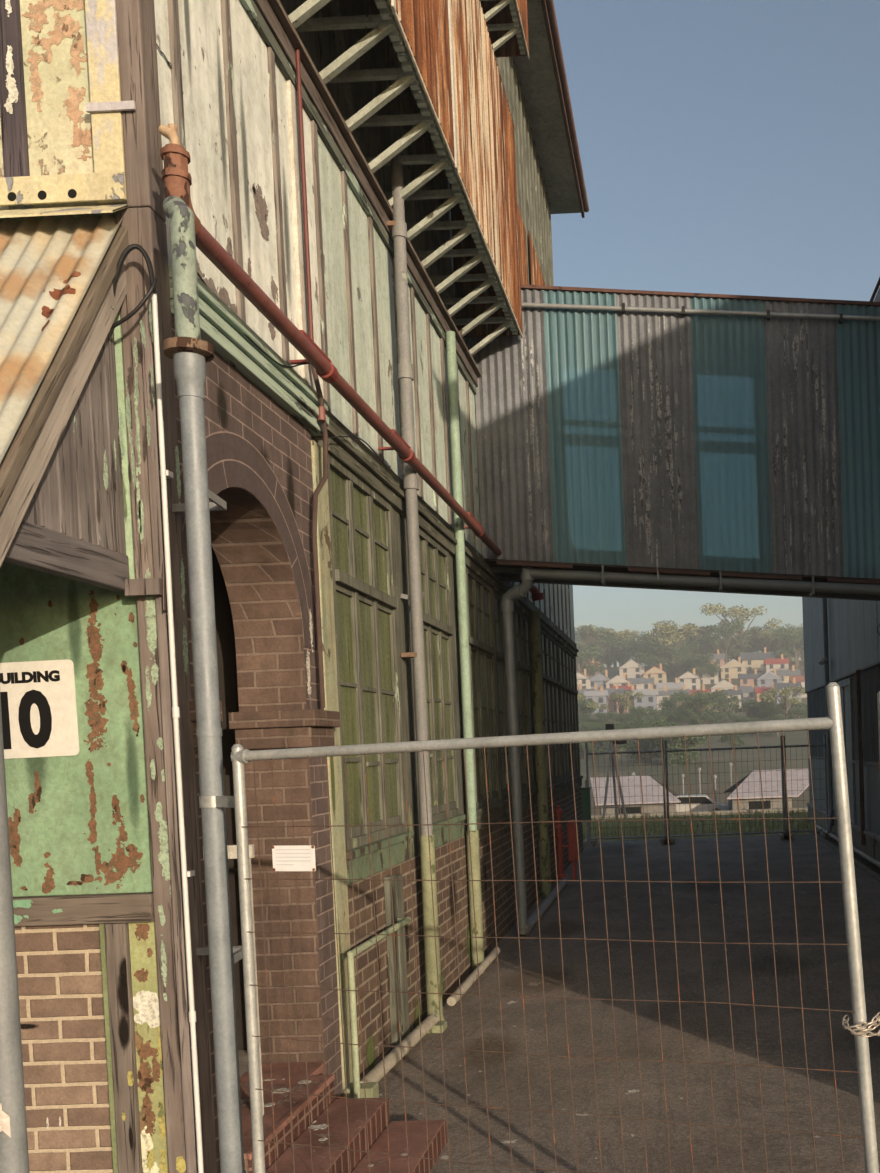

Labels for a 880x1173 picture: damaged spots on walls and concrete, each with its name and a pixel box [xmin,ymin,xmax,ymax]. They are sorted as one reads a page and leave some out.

peeling [4,0,92,161]
corrosion [0,230,97,331]
peeling [197,261,238,315]
peeling [252,183,269,241]
corrosion [517,203,546,286]
corrosion [0,361,37,395]
spalling [121,596,159,737]
spalling [8,590,143,924]
peeling [150,738,165,782]
peeling [133,794,172,1173]